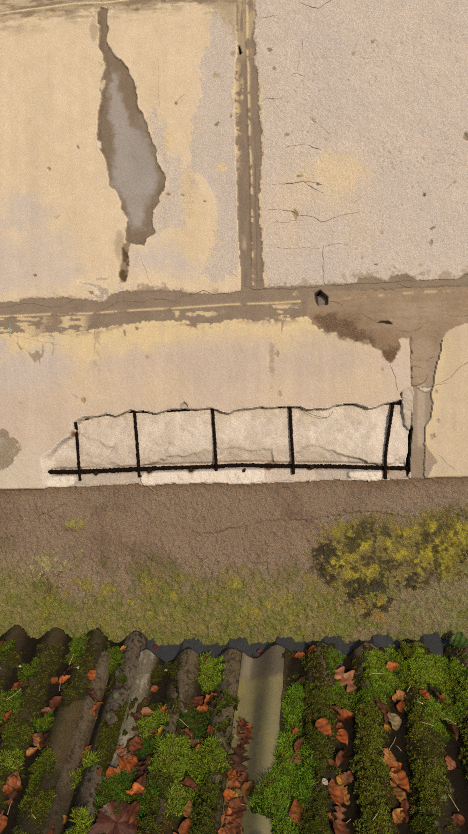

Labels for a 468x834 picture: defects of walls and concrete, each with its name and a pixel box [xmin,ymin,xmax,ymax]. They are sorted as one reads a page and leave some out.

peeling [97,6,240,292]
water stain [0,430,21,469]
spalling [40,387,439,489]